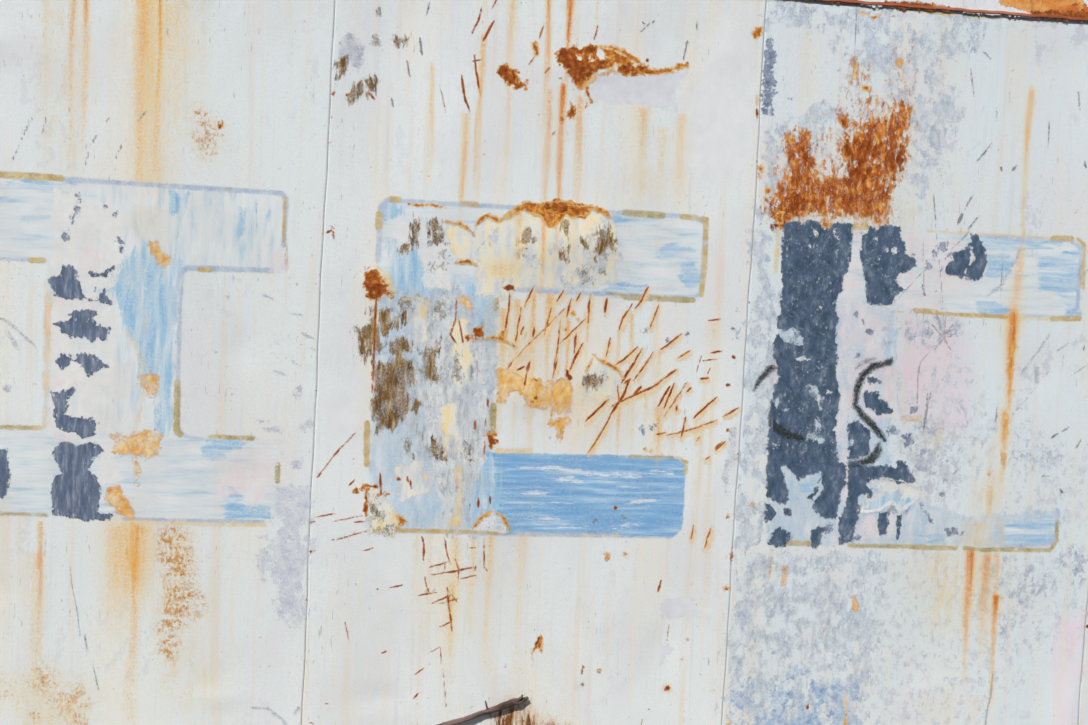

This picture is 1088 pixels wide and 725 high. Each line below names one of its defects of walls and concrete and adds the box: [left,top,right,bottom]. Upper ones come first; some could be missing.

rust [0,312,231,725]
rust [146,241,175,269]
peeling [352,472,407,538]
rust [392,438,441,503]
peeling [374,222,510,540]
peeling [407,202,516,237]
rust [376,516,602,725]
rust [362,0,696,471]
peeling [581,354,625,403]
rust [748,45,928,265]
peeling [714,0,1088,725]
rust [880,83,1039,725]